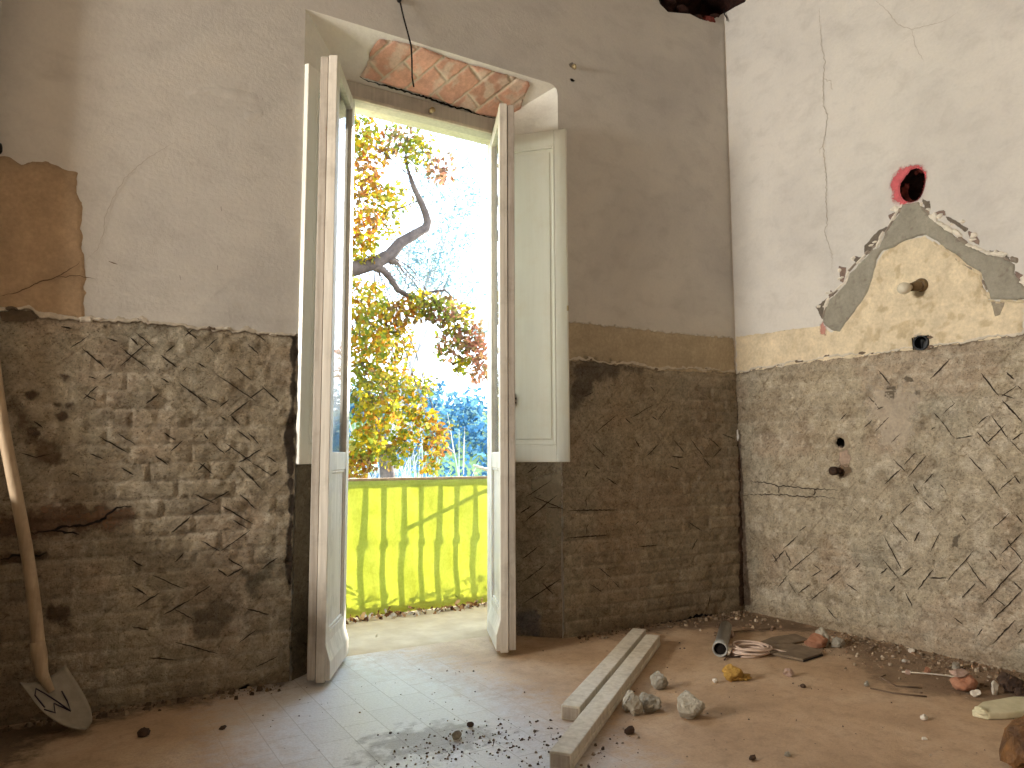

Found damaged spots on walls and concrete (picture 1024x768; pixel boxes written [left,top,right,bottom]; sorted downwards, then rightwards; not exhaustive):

crack [2,142,175,296]
flaking render [0,156,299,585]
flaking render [360,39,530,118]
spalling [659,0,746,23]
flaking render [569,165,1024,374]
crack [819,8,833,261]
crack [61,326,279,630]
crack [744,370,1023,643]
crack [151,608,269,660]